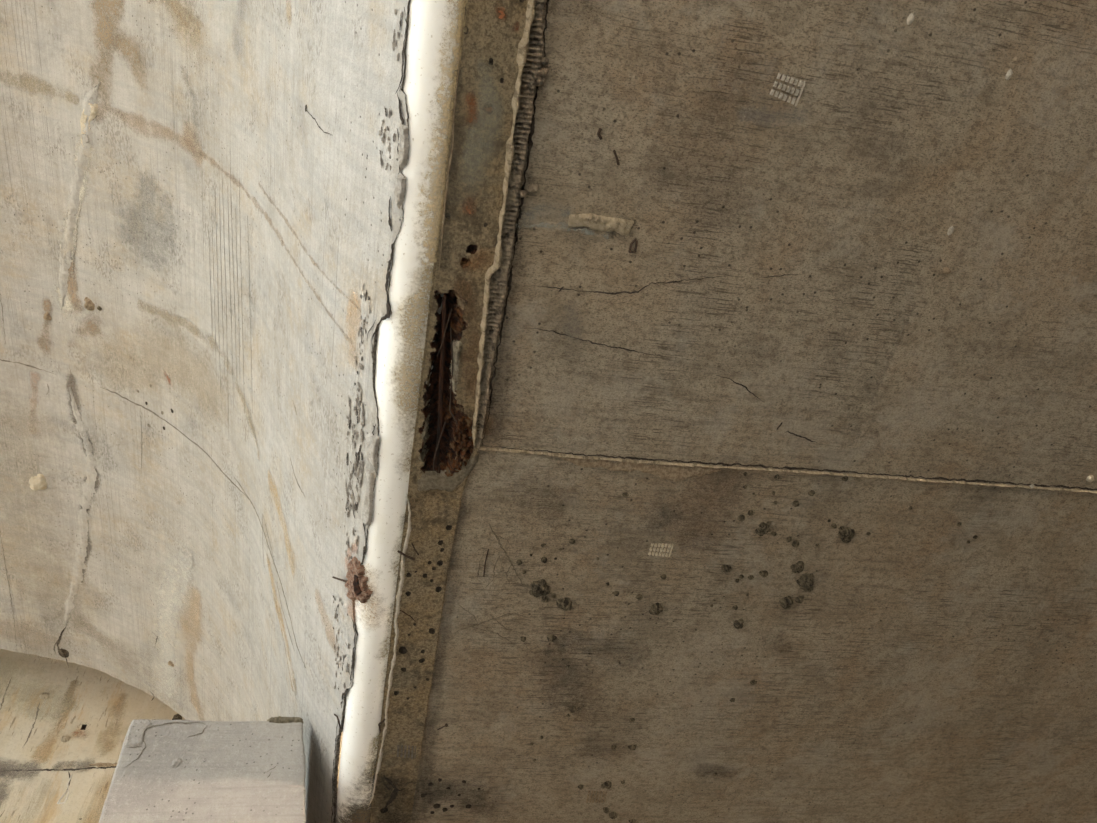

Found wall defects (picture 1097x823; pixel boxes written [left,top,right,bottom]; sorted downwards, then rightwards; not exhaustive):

crack [71,196,83,296]
peeling [333,8,409,708]
spalling [416,285,481,477]
spalling [396,623,438,673]